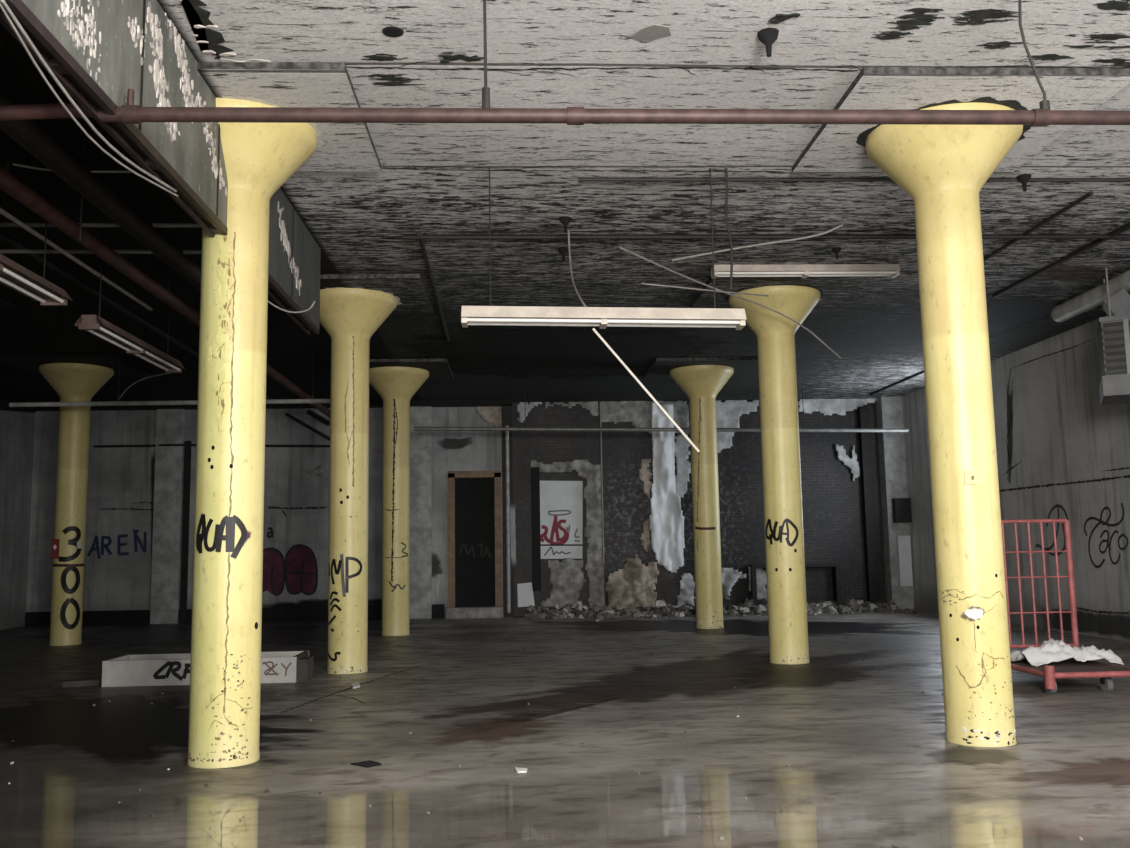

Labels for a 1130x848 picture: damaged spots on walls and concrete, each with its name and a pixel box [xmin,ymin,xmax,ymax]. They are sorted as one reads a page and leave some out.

spalling [128,0,270,107]
spalling [871,8,1019,40]
peeling [164,122,180,143]
peeling [192,122,227,196]
spalling [942,590,985,621]
crack [940,589,1005,688]